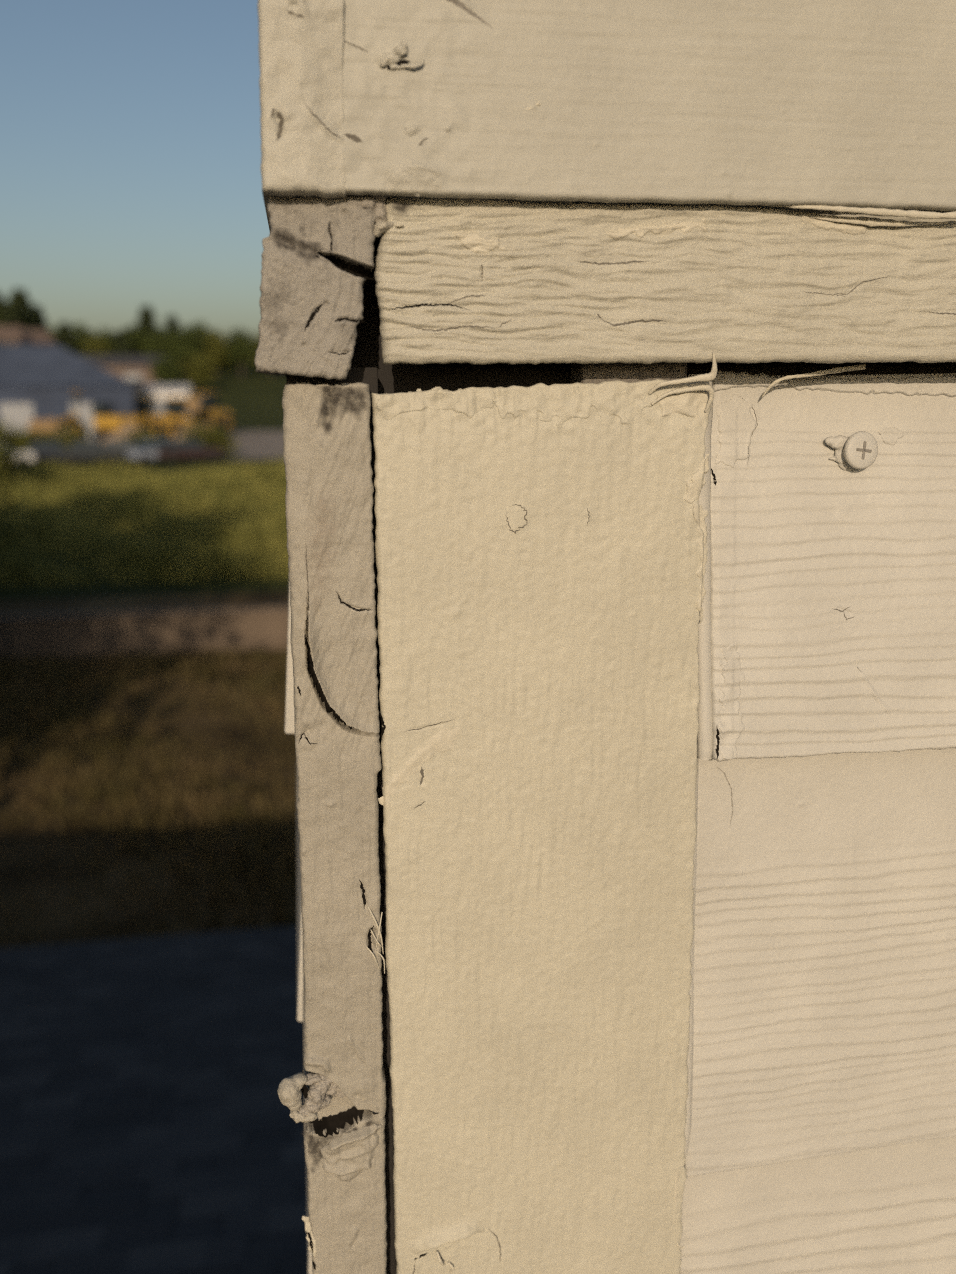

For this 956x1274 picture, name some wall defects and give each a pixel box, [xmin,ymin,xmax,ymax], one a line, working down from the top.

peeling [376,352,717,429]
crack [297,548,453,736]
peeling [717,642,745,762]
crack [359,879,385,974]